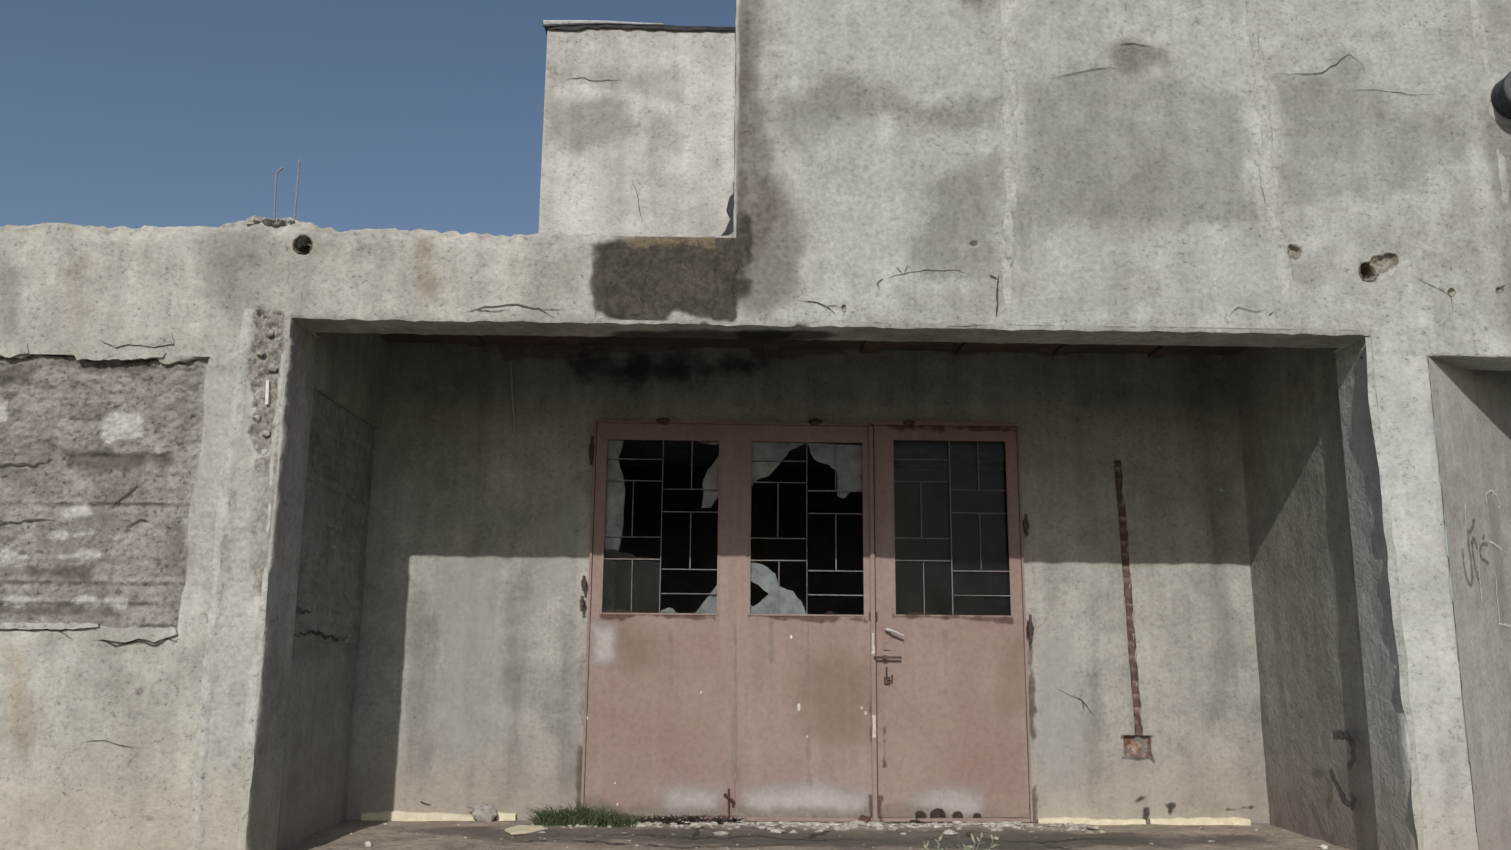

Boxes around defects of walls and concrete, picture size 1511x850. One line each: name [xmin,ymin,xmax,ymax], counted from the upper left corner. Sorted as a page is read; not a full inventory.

damp [570,150,833,383]
crack [877,265,999,327]
spalling [1359,253,1399,282]
spalling [0,332,209,647]
spalling [213,309,284,595]